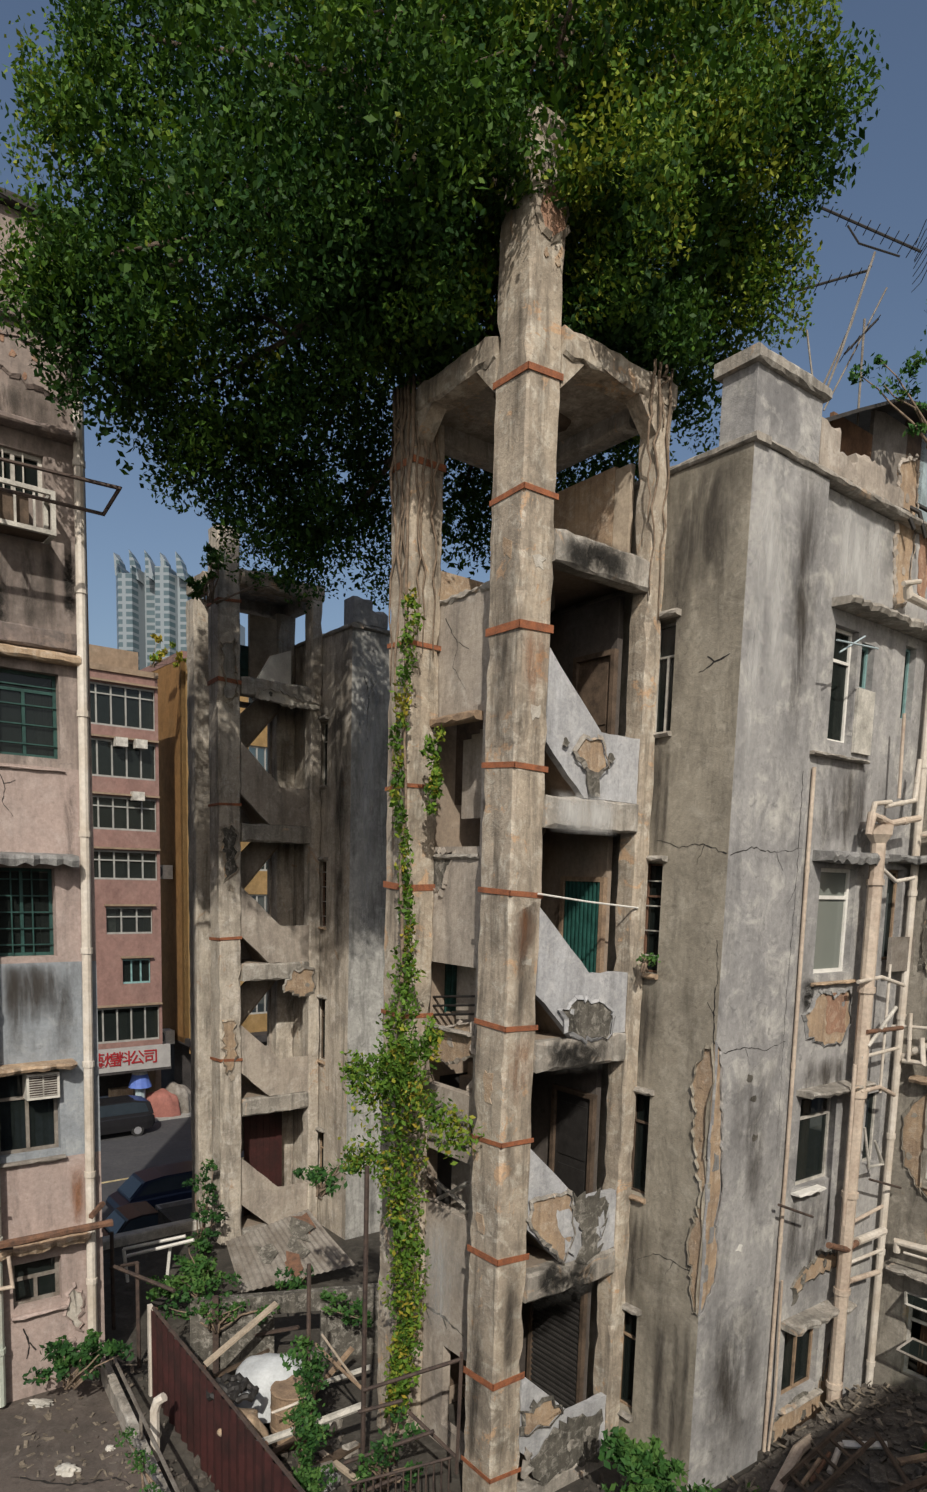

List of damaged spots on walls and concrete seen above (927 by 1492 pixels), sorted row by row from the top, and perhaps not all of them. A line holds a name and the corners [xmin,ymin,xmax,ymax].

flaking render [563,733,615,797]
crack [657,771,804,1156]
flaking render [801,987,853,1048]
flaking render [686,1040,743,1317]
flaking render [526,1188,579,1265]
flaking render [519,1395,603,1487]